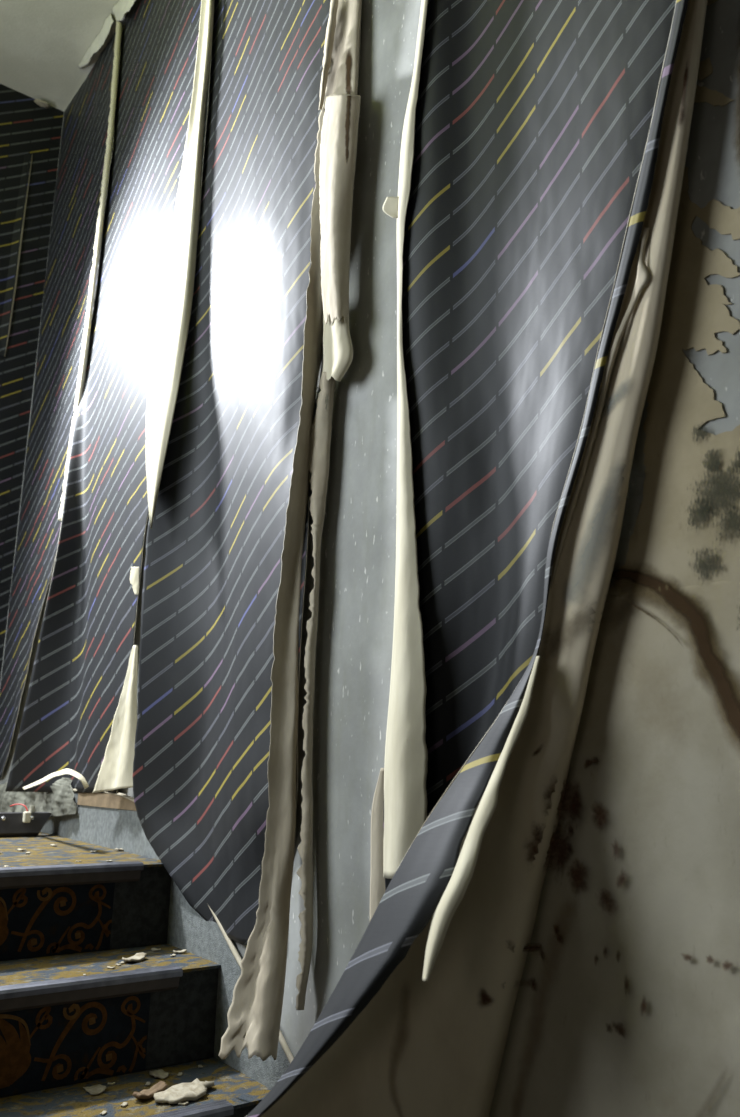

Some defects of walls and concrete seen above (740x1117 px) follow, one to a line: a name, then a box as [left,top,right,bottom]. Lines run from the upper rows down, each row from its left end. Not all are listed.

peeling [78,0,136,69]
peeling [318,0,339,110]
leakage [688,426,740,579]
leakage [611,568,740,746]